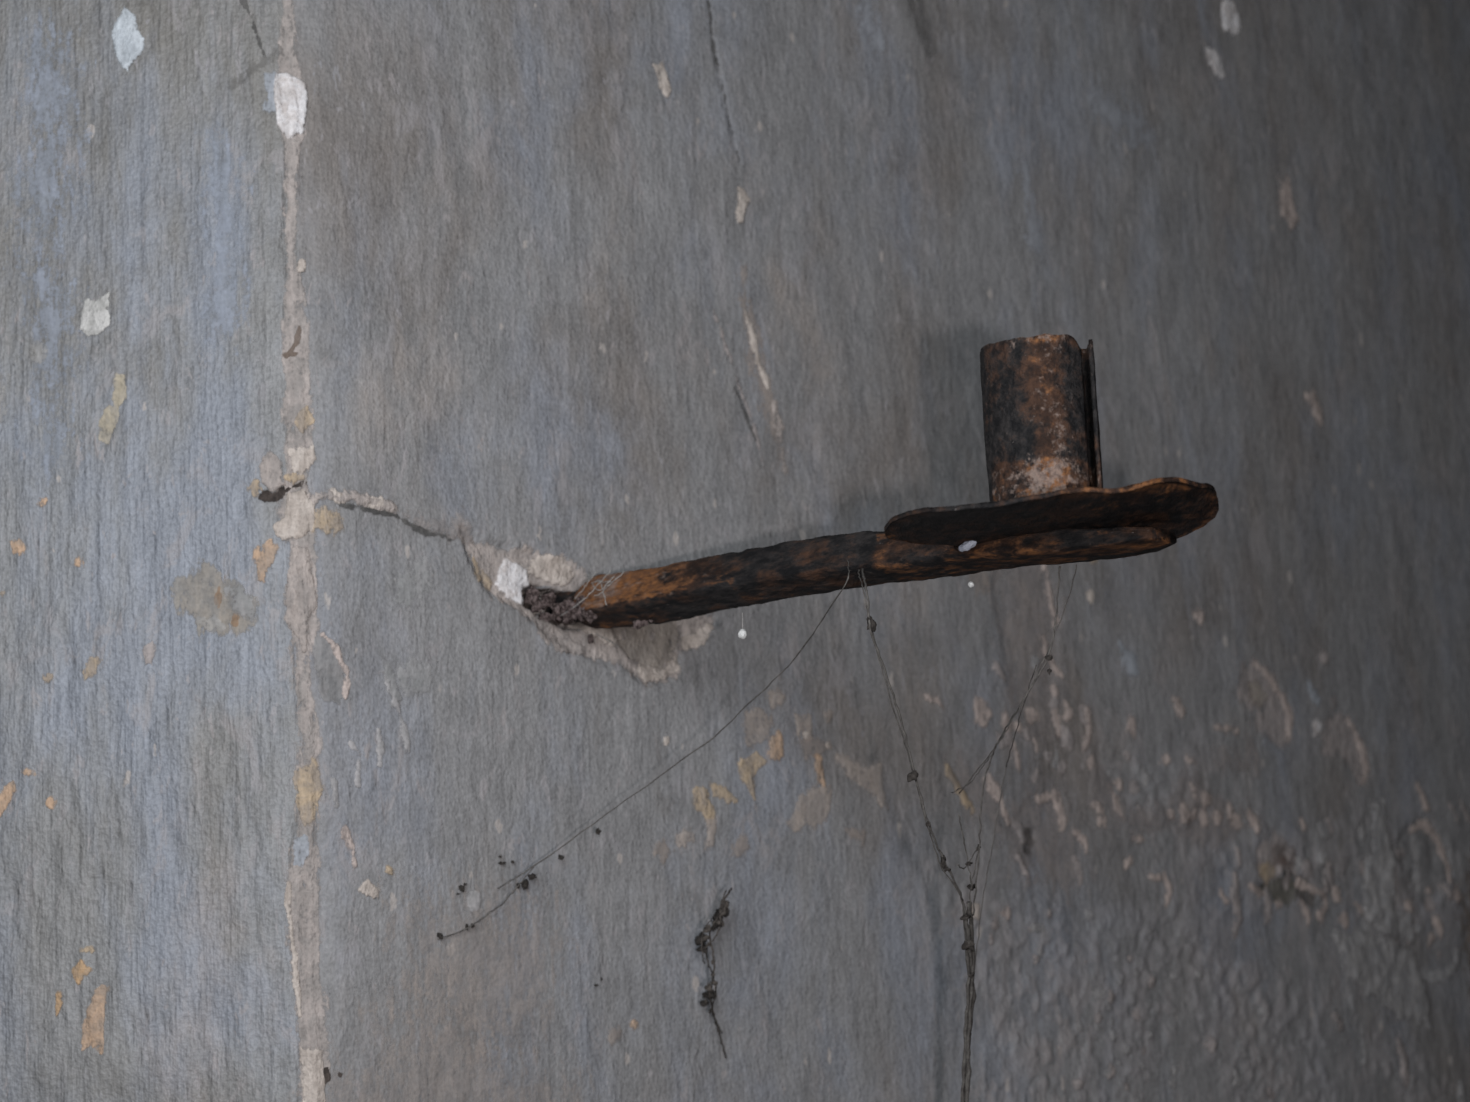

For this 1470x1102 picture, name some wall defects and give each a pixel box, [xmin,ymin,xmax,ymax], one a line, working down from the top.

flaking render [111,7,144,71]
flaking render [253,0,385,1102]
flaking render [458,526,714,686]
peeling [0,768,31,816]
peeling [653,690,888,863]
peeling [943,565,1171,903]
peeling [1234,658,1294,781]
peeling [1307,679,1371,789]
peeling [341,825,393,899]
peeling [1219,817,1372,940]
peeling [72,946,109,1054]